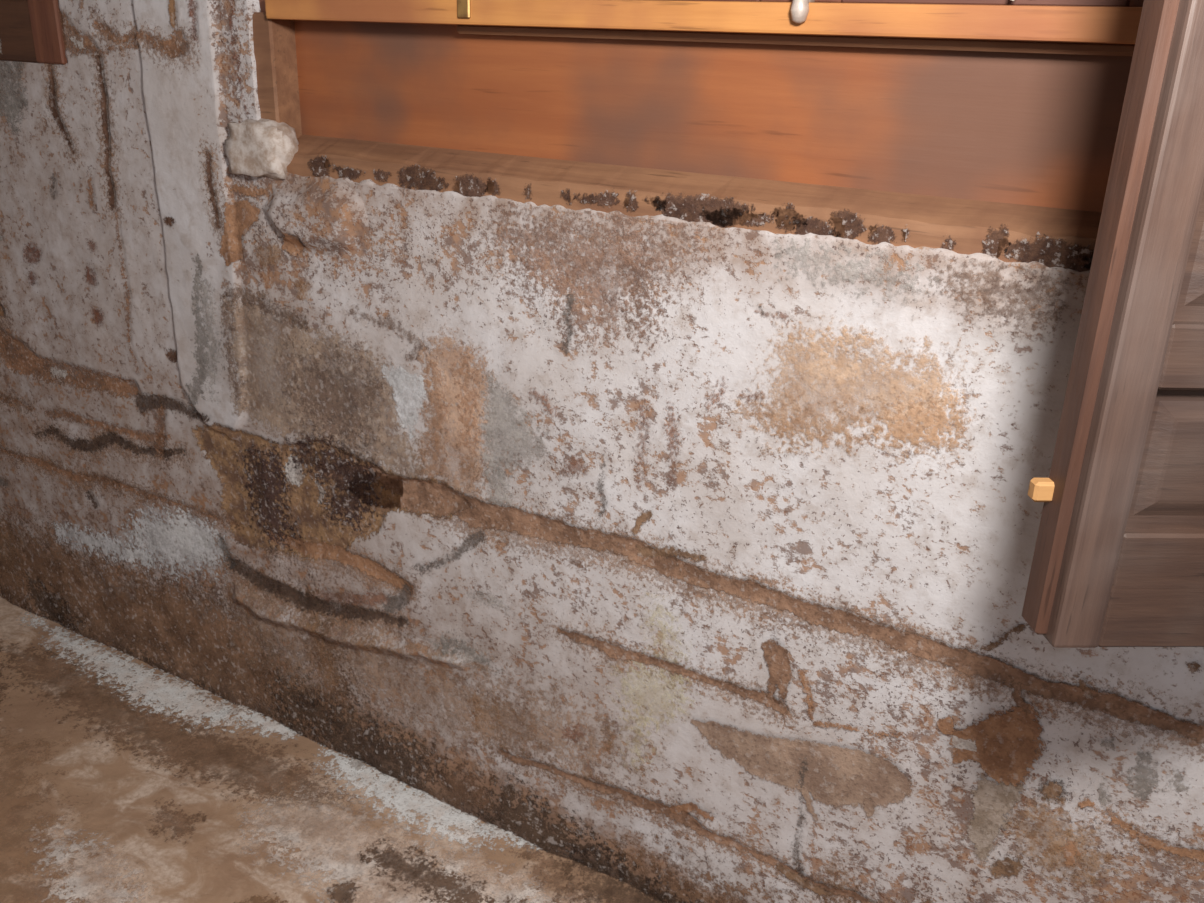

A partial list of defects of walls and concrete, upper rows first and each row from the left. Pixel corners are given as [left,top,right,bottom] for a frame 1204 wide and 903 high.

crack [229,0,246,111]
crack [42,0,200,373]
crack [198,141,225,240]
crack [562,294,574,353]
flaking render [192,422,472,564]
crack [0,390,1204,762]
leakage [0,498,801,903]
flaking render [691,719,912,821]
flaking render [936,704,1120,886]
leakage [1098,777,1112,807]
leakage [1100,739,1190,800]